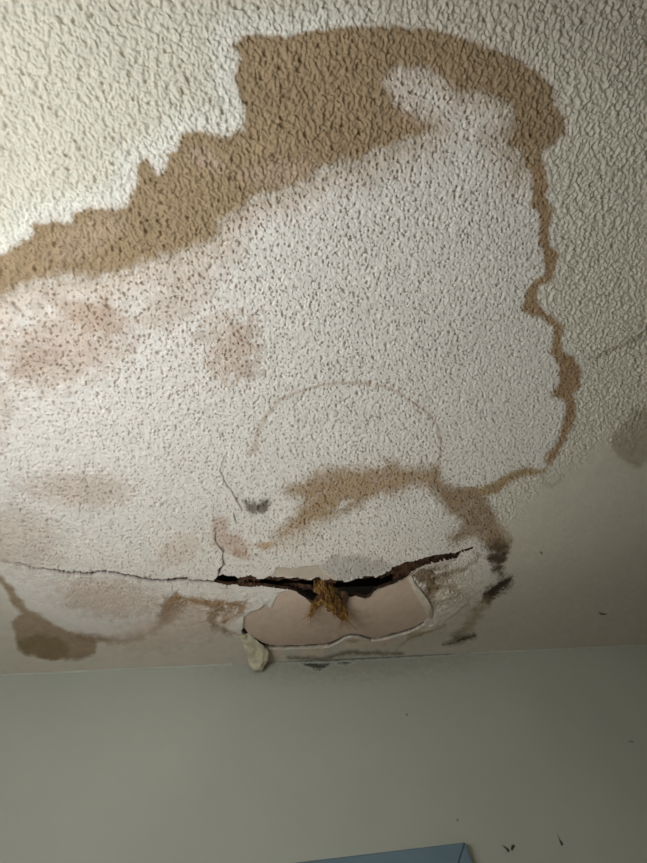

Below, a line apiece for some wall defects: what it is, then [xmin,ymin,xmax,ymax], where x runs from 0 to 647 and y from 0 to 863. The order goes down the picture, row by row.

damp [0,12,584,692]
damp [608,405,647,471]
crack [0,455,243,584]